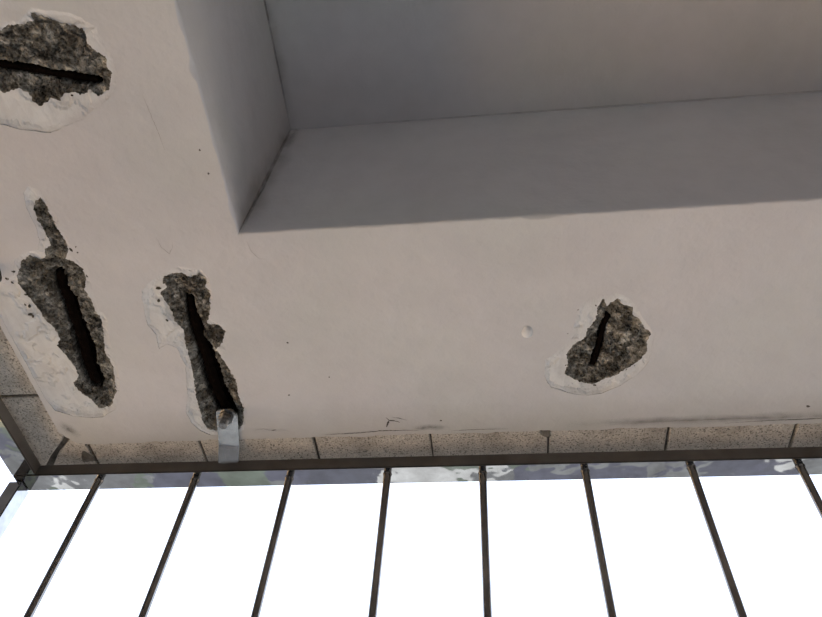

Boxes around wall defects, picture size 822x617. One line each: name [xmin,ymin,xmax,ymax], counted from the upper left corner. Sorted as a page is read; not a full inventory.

spalling [0,8,118,133]
spalling [0,186,121,418]
spalling [142,266,248,435]
spalling [544,293,654,395]